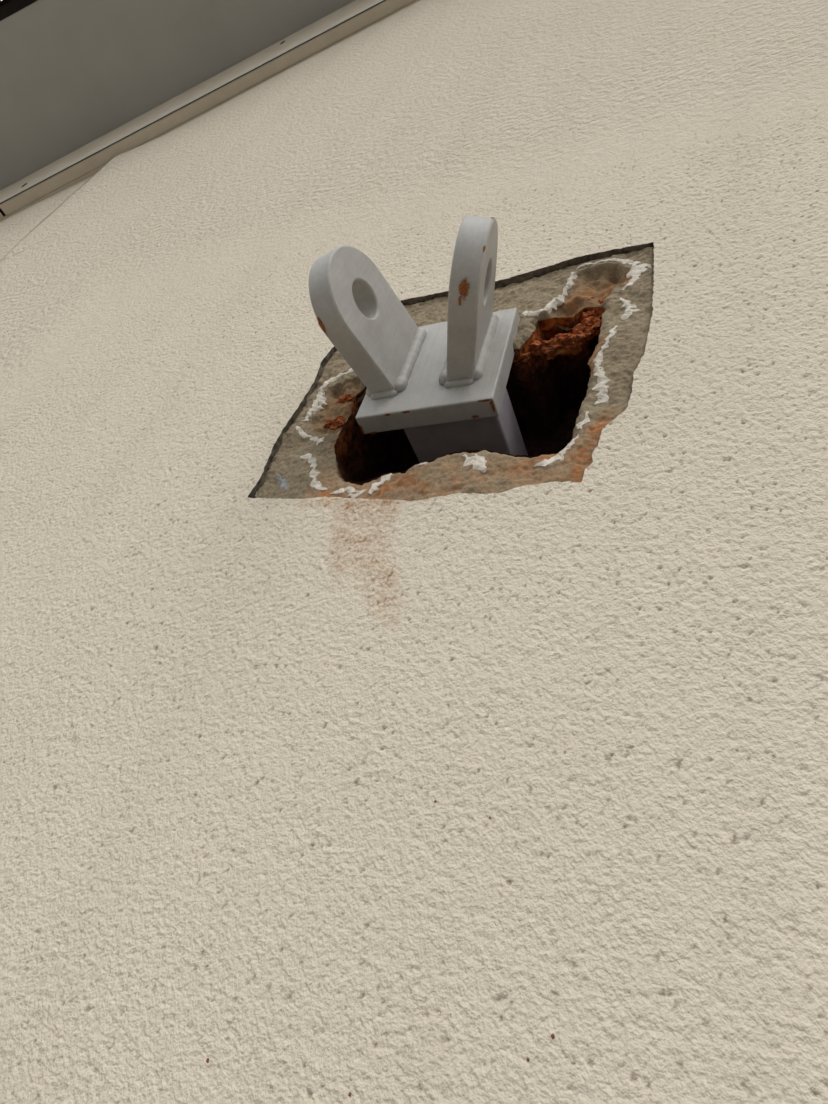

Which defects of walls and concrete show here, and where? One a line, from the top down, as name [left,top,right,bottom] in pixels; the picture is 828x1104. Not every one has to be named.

hole [248,242,654,501]